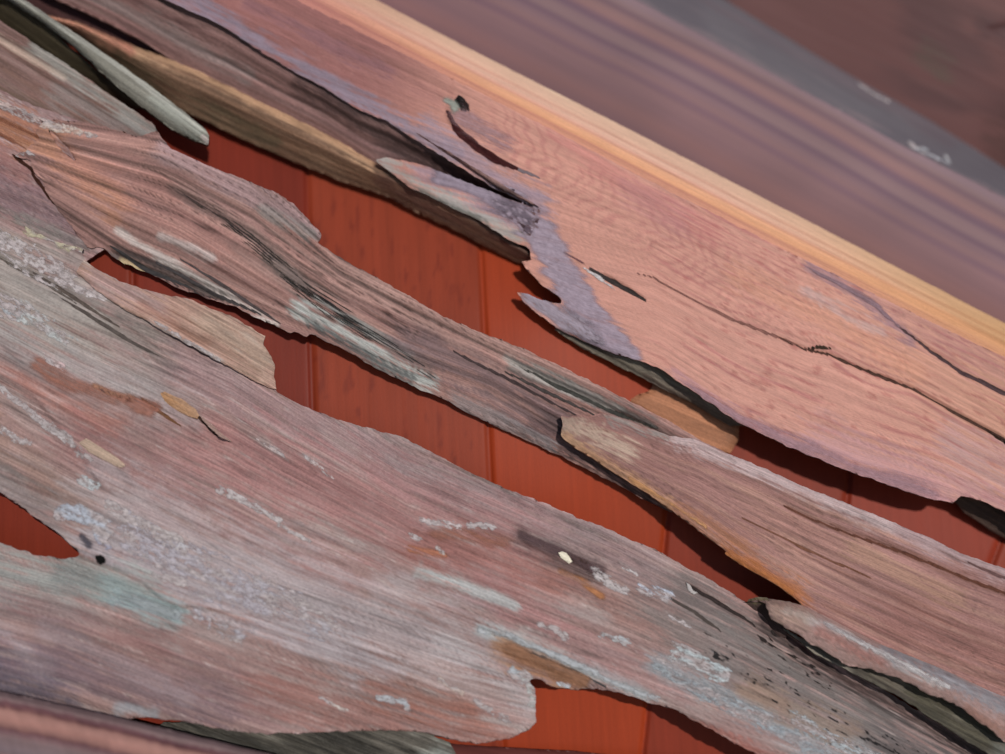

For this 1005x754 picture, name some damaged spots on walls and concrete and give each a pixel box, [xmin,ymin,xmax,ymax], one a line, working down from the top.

peeling [39,119,98,138]
crack [446,110,540,179]
peeling [54,260,276,390]
crack [564,252,1005,442]
peeling [76,475,101,491]
peeling [466,522,497,530]
peeling [538,622,569,642]
peeling [598,632,632,646]
peeling [790,710,878,754]